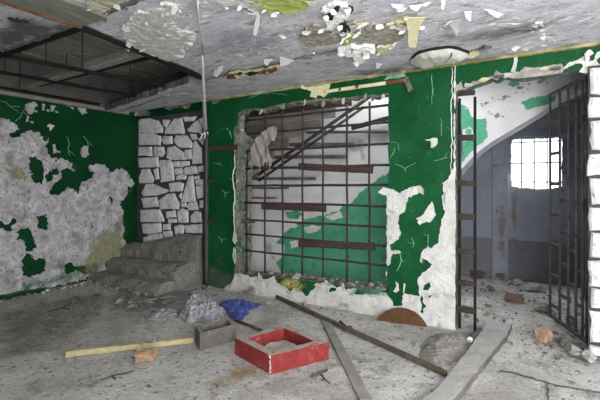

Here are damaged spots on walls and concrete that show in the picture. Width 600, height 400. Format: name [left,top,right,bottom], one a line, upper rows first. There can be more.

flaking render [121,1,196,62]
flaking render [194,0,472,79]
flaking render [0,101,135,295]
peeling [224,9,600,330]